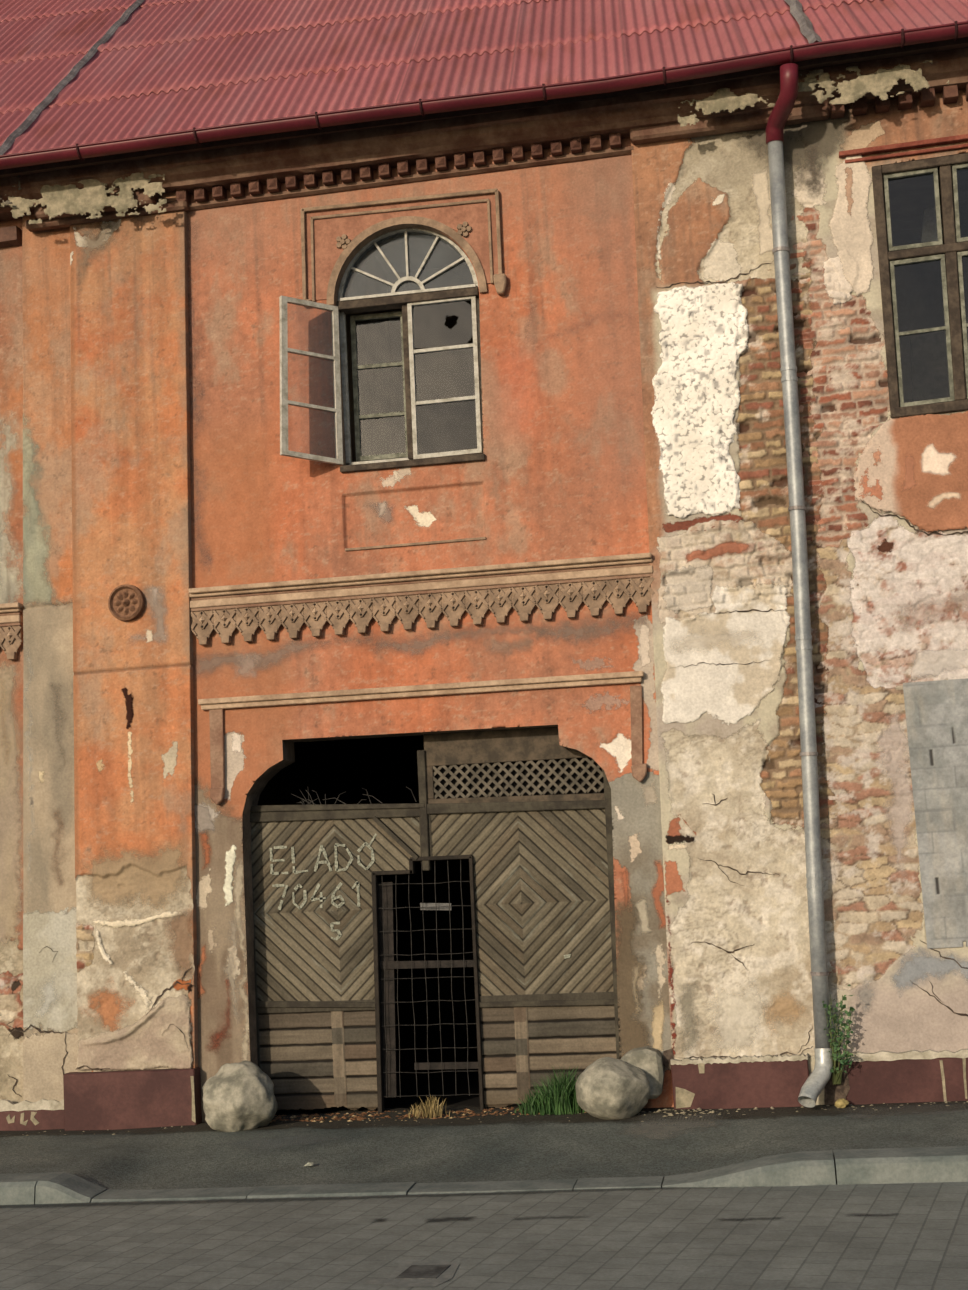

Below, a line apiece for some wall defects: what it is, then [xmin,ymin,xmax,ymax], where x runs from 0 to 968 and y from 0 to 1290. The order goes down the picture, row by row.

flaking render [794,60,932,105]
flaking render [0,172,167,265]
flaking render [371,467,436,527]
flaking render [582,88,968,1073]
corrosion [121,687,134,805]
flaking render [195,731,246,833]
crack [698,858,779,886]
flaking render [0,939,55,1126]
flaking render [75,847,241,1054]
crack [146,968,198,1015]
crack [700,942,755,968]
crack [915,941,968,1016]